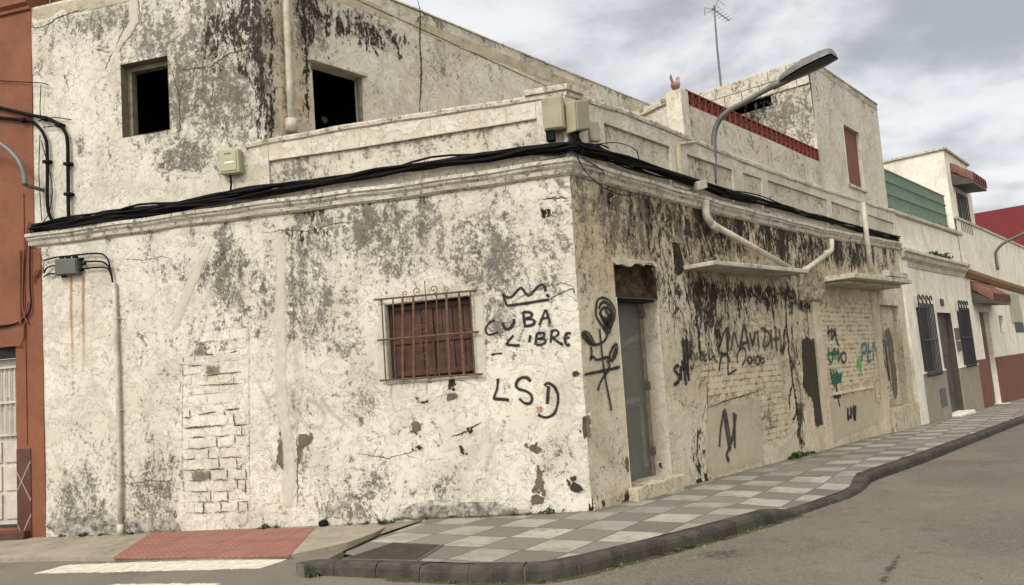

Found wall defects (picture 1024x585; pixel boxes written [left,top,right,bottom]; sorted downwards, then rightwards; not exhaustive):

water stain [153,0,279,181]
water stain [293,0,409,122]
crack [415,2,423,112]
water stain [737,222,876,271]
corrosion [70,276,84,328]
water stain [652,233,810,376]
flaking render [180,328,255,514]
spalling [276,432,314,472]
spalling [446,379,459,402]
spalling [524,442,548,509]
spalling [566,475,595,511]
water stain [692,429,707,481]